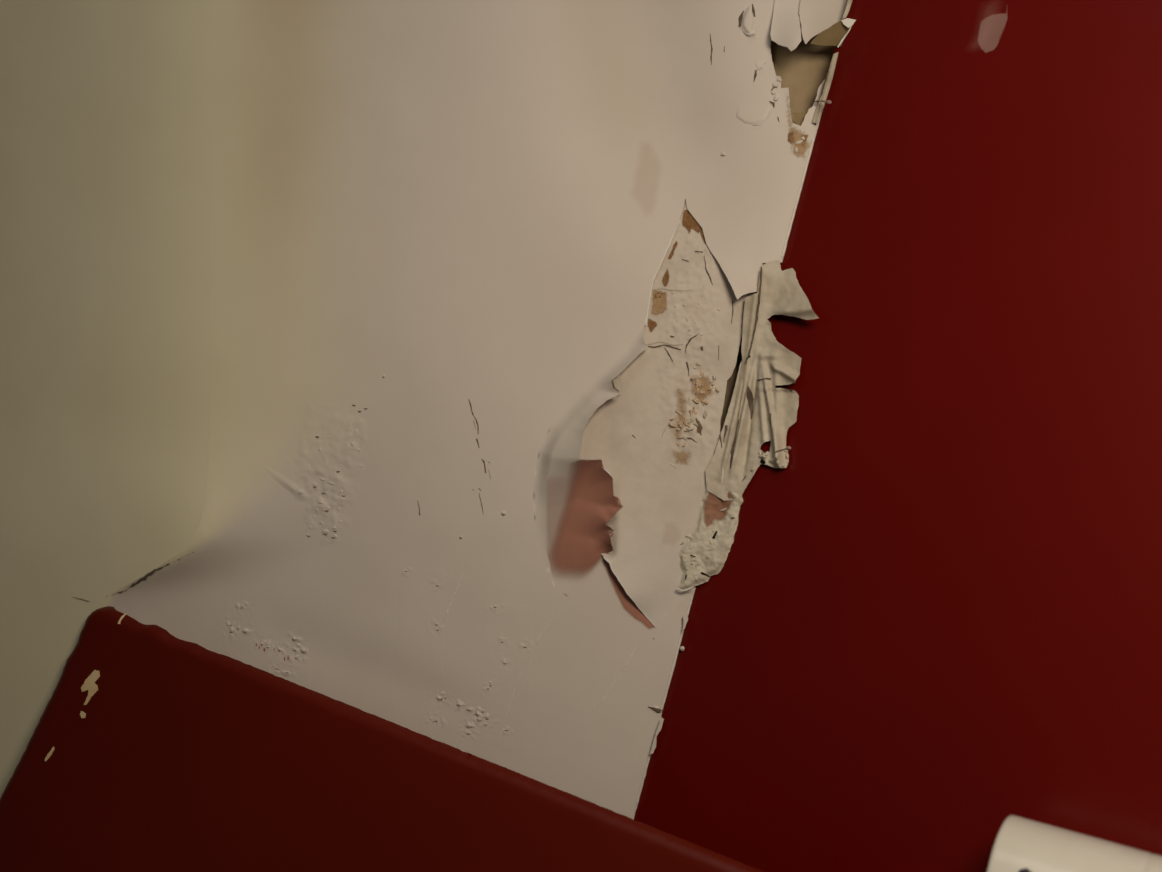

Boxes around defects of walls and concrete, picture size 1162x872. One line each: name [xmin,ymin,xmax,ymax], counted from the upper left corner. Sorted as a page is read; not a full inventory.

spalling [769,0,856,156]
peeling [533,199,763,639]
peeling [80,670,100,718]
spalling [650,718,664,754]